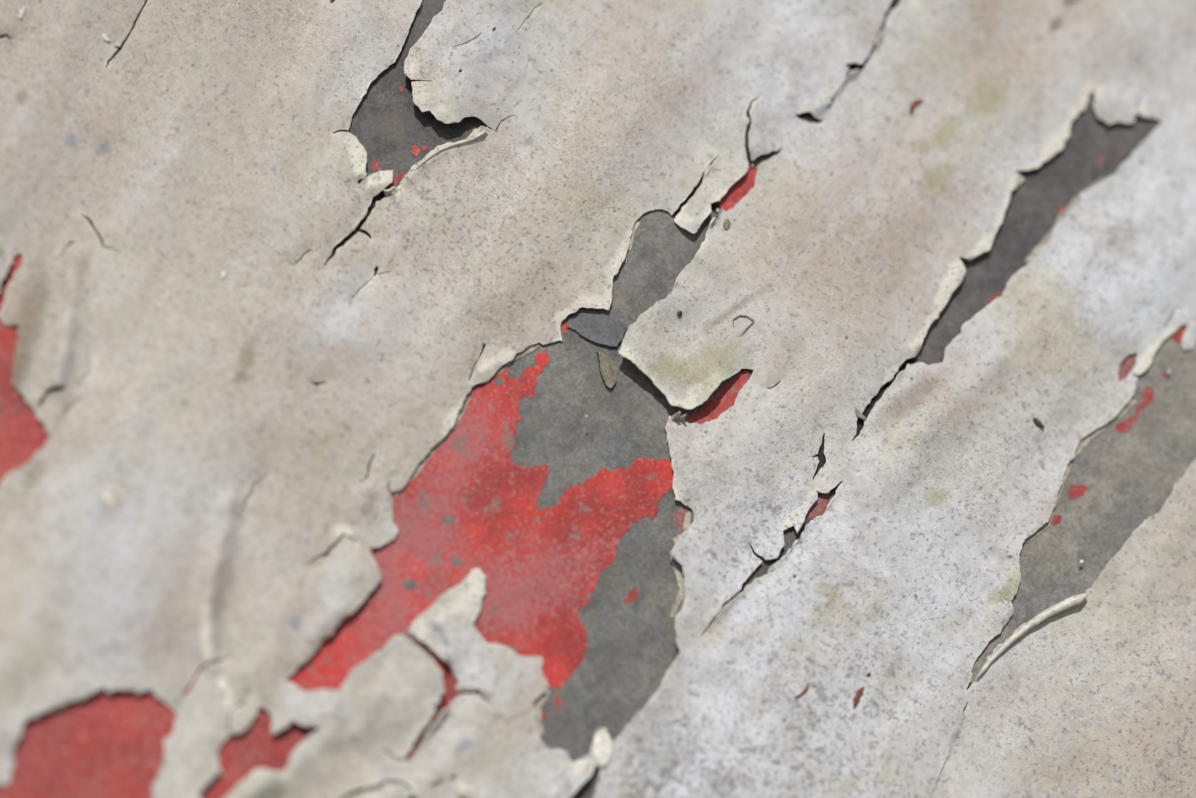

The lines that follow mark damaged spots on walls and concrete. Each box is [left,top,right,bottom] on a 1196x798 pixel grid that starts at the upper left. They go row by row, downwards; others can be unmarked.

peeling [341,0,511,198]
crack [795,0,901,123]
crack [293,192,391,298]
peeling [875,83,1162,411]
peeling [0,253,68,519]
peeling [199,159,840,798]
crack [701,544,764,636]
peeling [970,324,1196,685]
peeling [0,666,177,798]